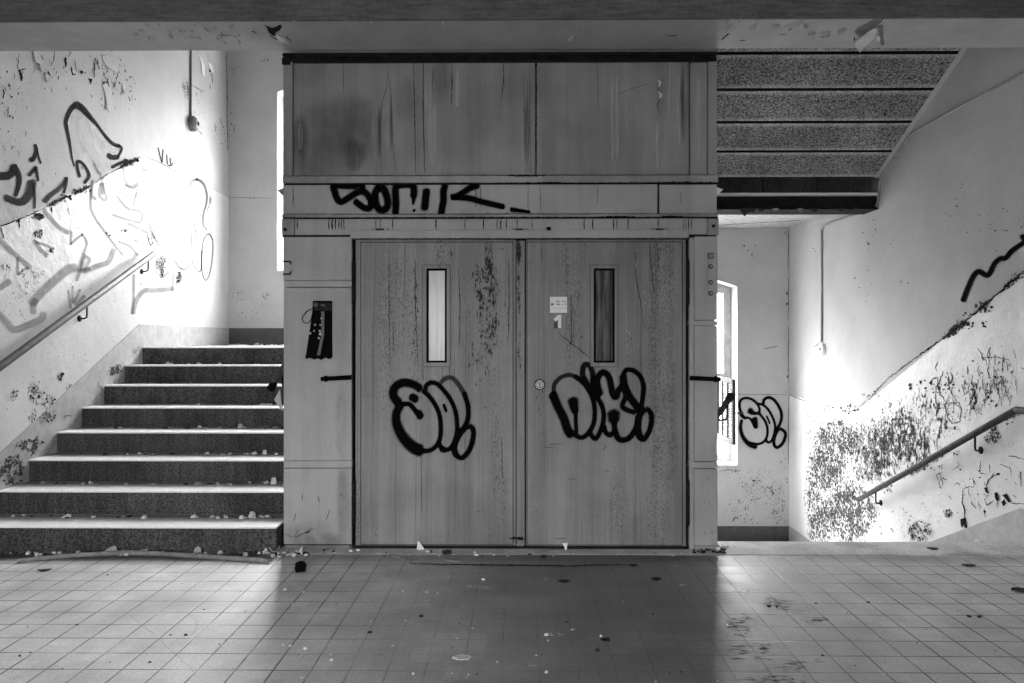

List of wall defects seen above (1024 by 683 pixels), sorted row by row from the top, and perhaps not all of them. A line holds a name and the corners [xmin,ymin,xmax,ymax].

peeling [0,51,136,156]
peeling [0,377,70,485]
peeling [790,271,1024,542]